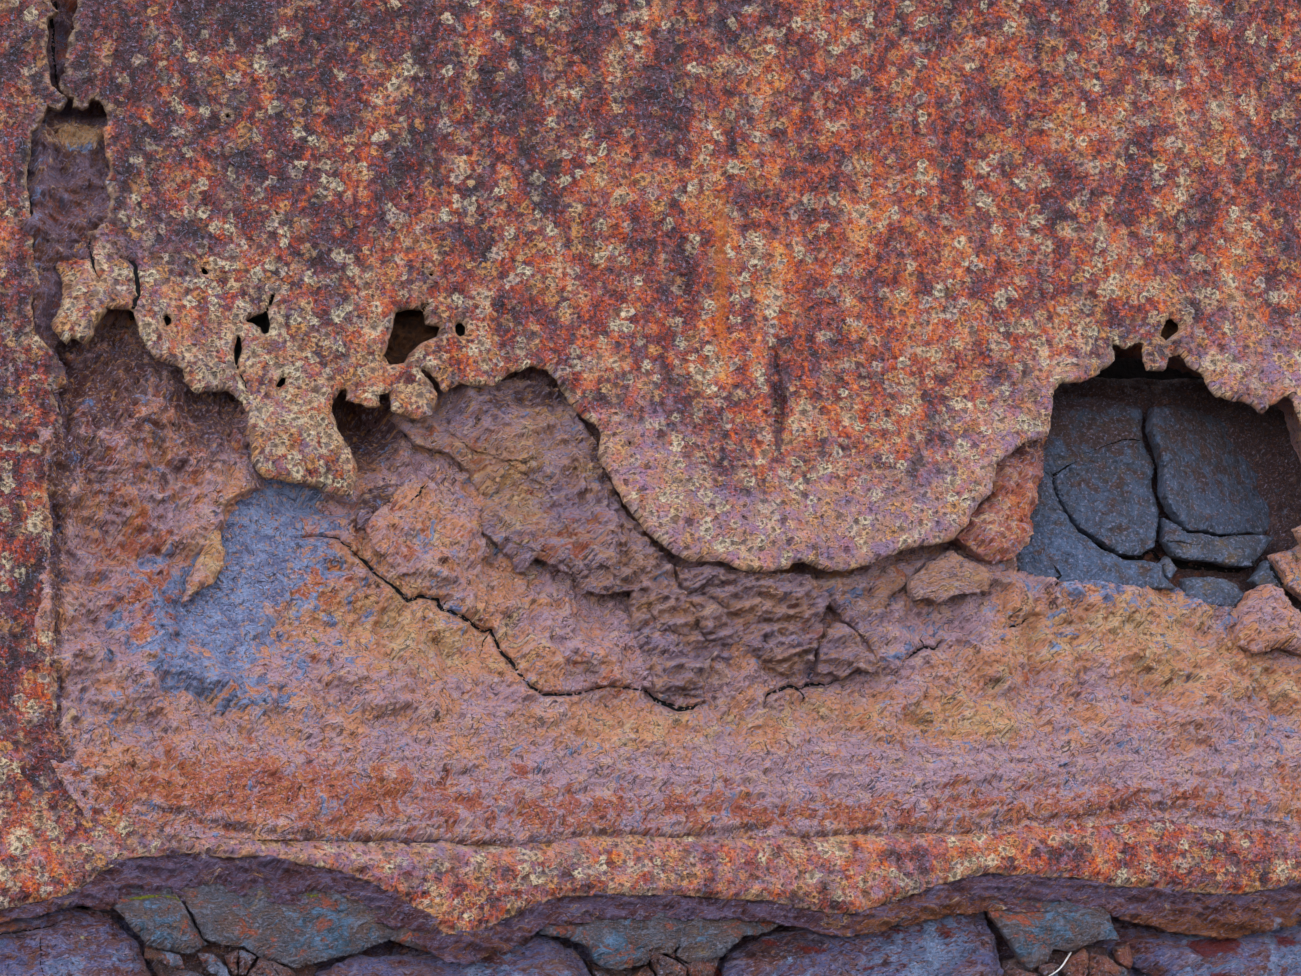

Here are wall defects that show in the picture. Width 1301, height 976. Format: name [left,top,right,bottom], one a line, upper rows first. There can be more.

crack [49,1,73,106]
corrosion [46,0,78,95]
peeling [52,286,113,342]
corrosion [23,99,1301,846]
spalling [175,366,1047,697]
crack [1052,563,1062,586]
crack [1098,526,1283,588]
crack [307,536,703,712]
crack [907,636,939,659]
peeling [1233,584,1301,656]
crack [764,680,839,704]
crack [0,919,66,976]